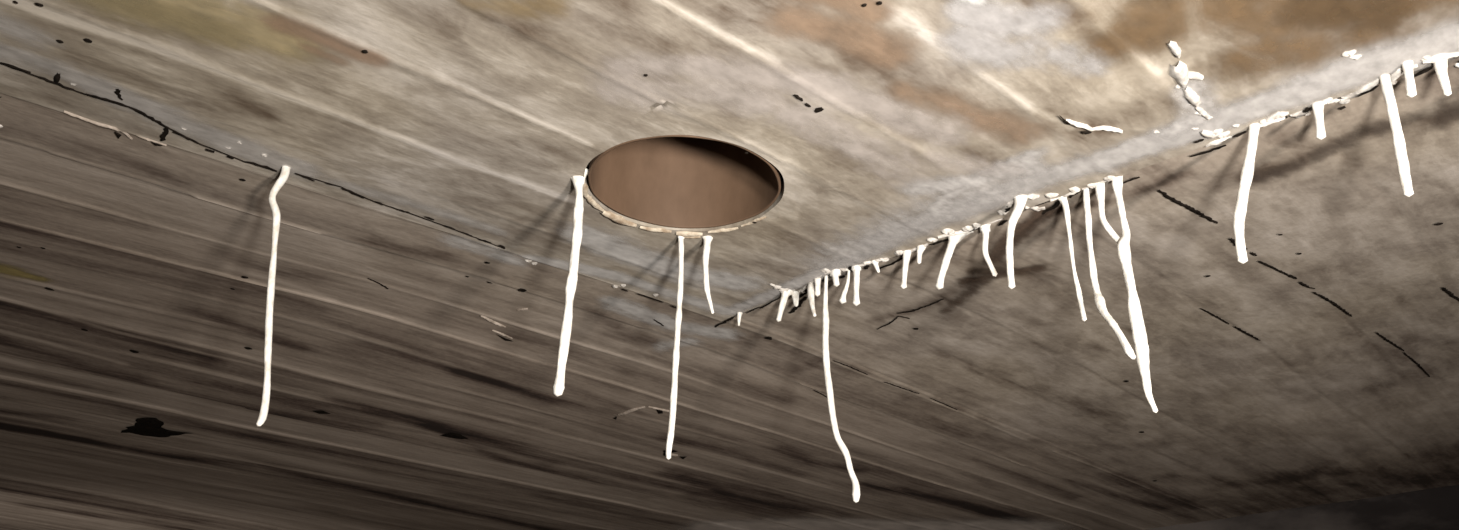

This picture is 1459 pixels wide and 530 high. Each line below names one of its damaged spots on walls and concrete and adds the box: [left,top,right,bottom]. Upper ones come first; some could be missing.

water stain [0,18,316,176]
water stain [103,0,310,54]
crack [0,62,505,249]
water stain [335,24,1459,348]
water stain [947,0,1101,73]
crack [1190,85,1379,157]
crack [1414,61,1459,77]
crack [622,289,677,326]
crack [715,191,1081,330]
crack [1123,177,1430,377]
crack [1442,287,1459,300]